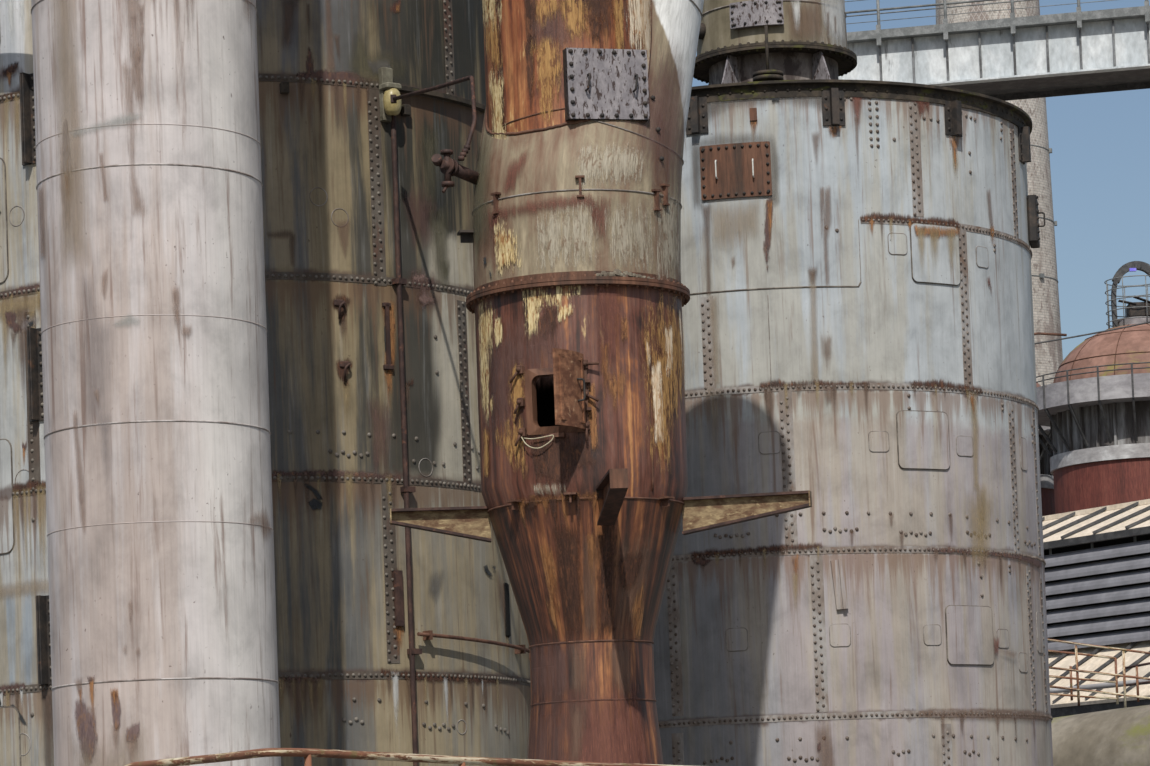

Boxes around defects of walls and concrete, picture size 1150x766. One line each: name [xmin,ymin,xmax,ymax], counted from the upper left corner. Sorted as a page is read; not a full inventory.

rust [524,0,537,108]
peeling [579,144,643,186]
peeling [489,219,521,277]
peeling [537,200,681,278]
rust [860,212,960,254]
peeling [523,285,581,337]
peeling [479,301,561,475]
rust [518,285,627,687]
peeling [644,296,685,461]
rust [760,380,870,415]
rust [911,380,984,509]
rust [592,525,643,637]